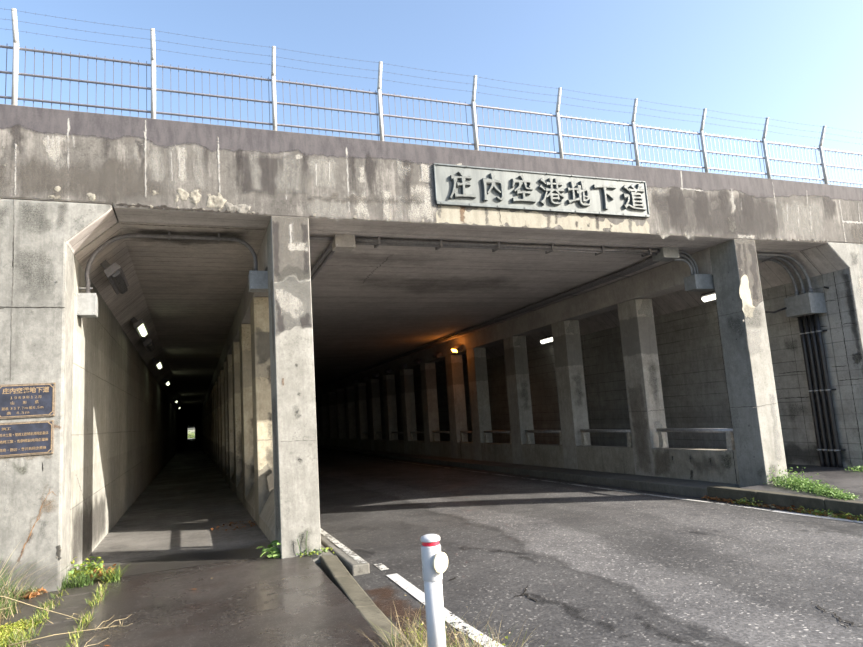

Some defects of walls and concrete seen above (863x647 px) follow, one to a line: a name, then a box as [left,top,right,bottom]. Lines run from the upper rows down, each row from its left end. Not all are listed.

spalling [114,188,267,215]
leakage [0,104,863,364]
crack [0,199,65,380]
peeling [739,259,757,322]
crack [20,462,57,557]